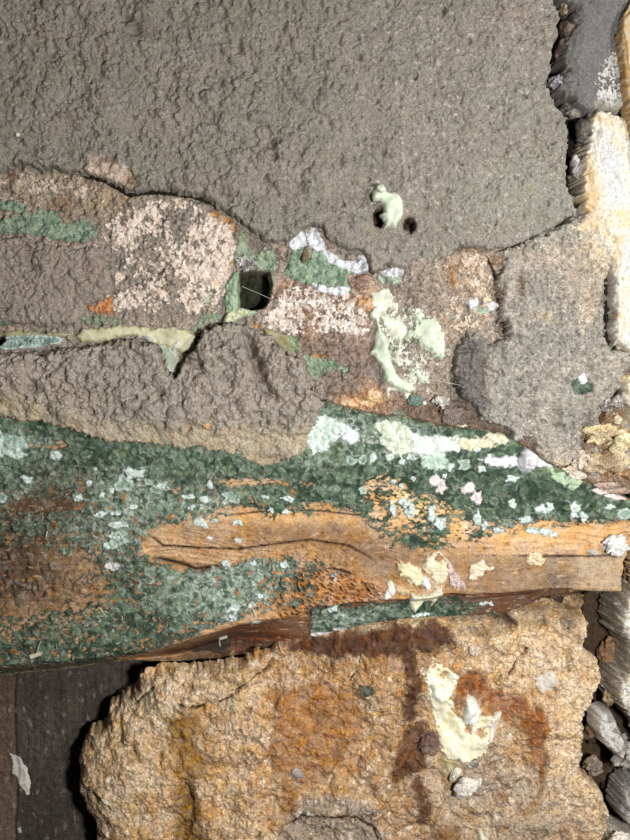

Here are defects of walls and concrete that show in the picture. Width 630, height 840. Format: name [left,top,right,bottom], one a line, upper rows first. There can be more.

crack [546,23,560,88]
crack [76,168,214,207]
spalling [369,193,383,228]
crack [565,120,577,192]
spalling [234,253,269,311]
spalling [407,394,424,406]
rust [267,681,361,816]
rust [452,669,551,815]